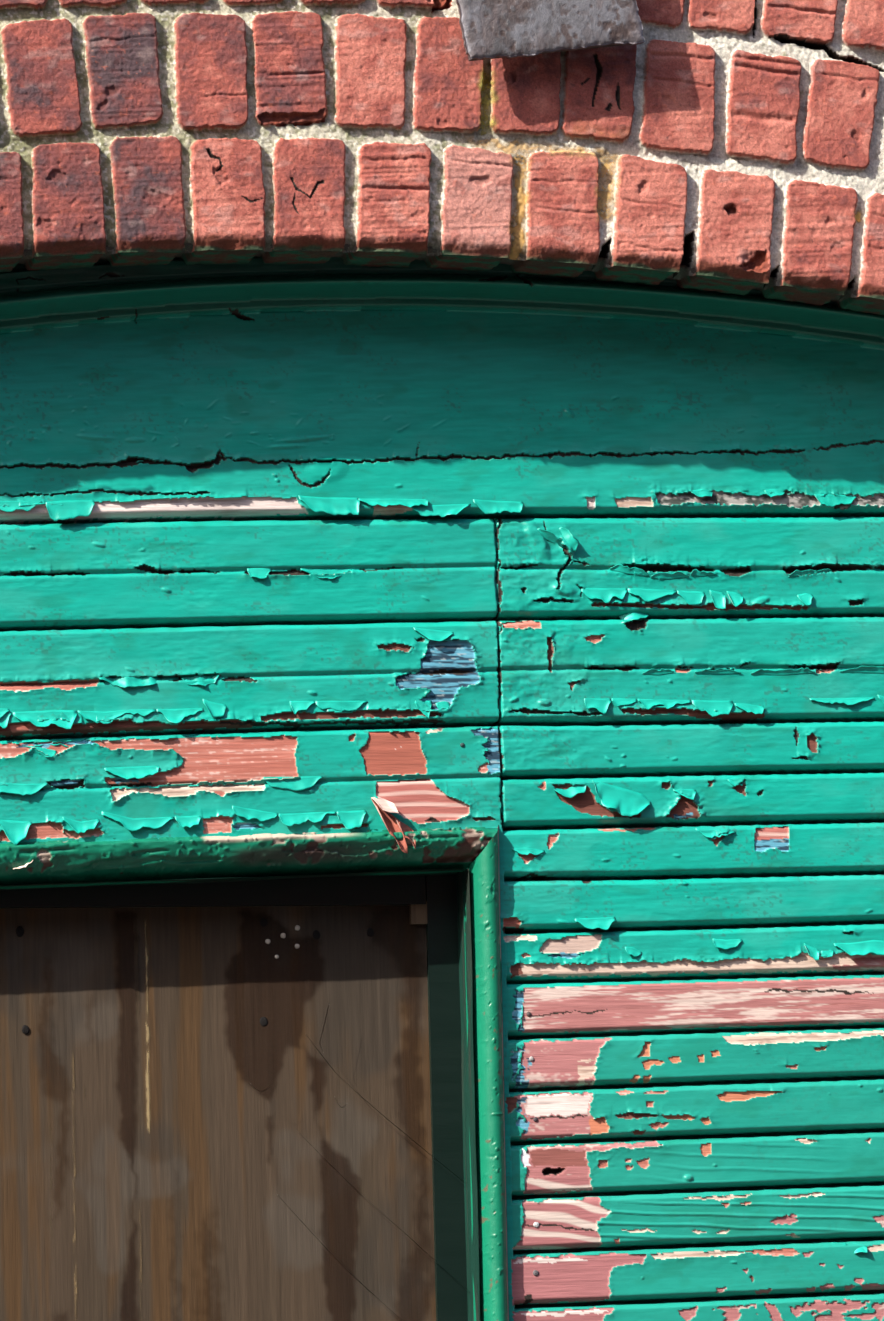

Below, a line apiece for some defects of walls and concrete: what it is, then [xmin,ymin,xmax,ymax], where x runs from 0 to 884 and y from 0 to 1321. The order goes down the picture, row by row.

crack [206,148,224,172]
crack [242,177,325,214]
peeling [0,496,523,525]
crack [0,439,884,498]
peeling [615,489,884,510]
peeling [581,563,813,631]
peeling [782,563,884,577]
peeling [510,662,884,724]
peeling [0,627,495,853]
water stain [225,912,322,1098]
peeling [502,917,884,1321]
water stain [322,1141,358,1321]